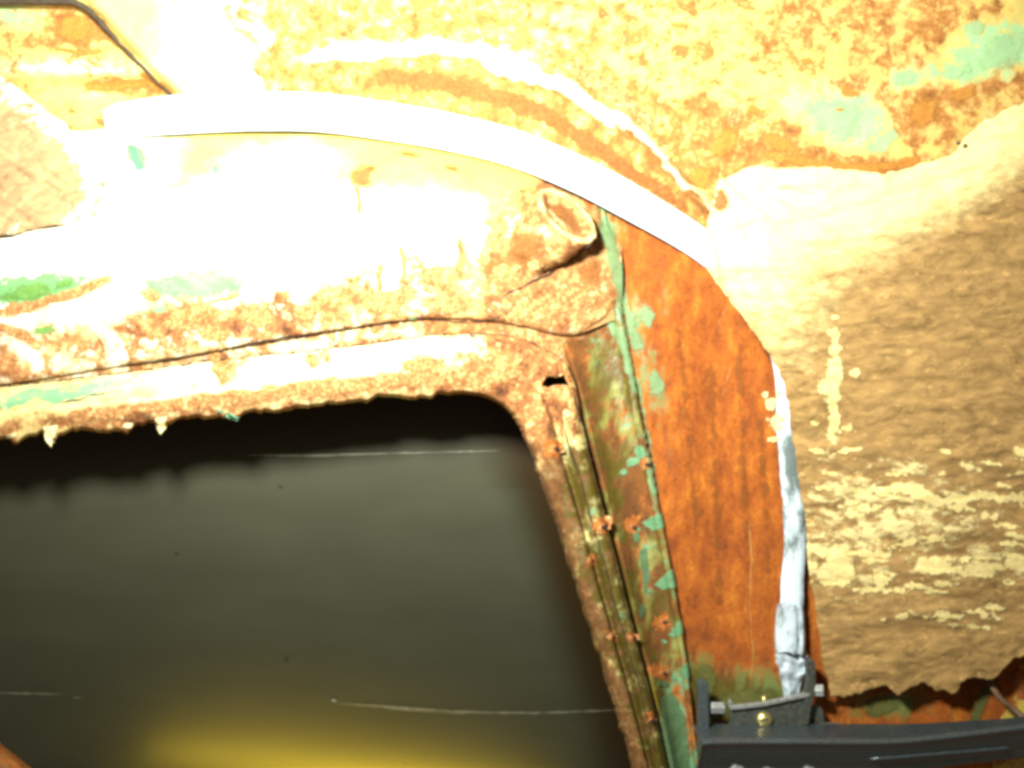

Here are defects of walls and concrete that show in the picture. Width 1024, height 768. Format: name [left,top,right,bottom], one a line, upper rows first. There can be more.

peeling [941,21,1024,79]
rust [350,165,375,214]
rust [376,69,687,212]
peeling [779,90,898,153]
rust [763,135,919,172]
rust [0,275,112,349]
rust [497,260,606,331]
rust [66,287,534,427]
peeling [599,220,664,494]
peeling [634,513,676,619]
peeling [661,621,683,643]
peeling [658,662,690,768]